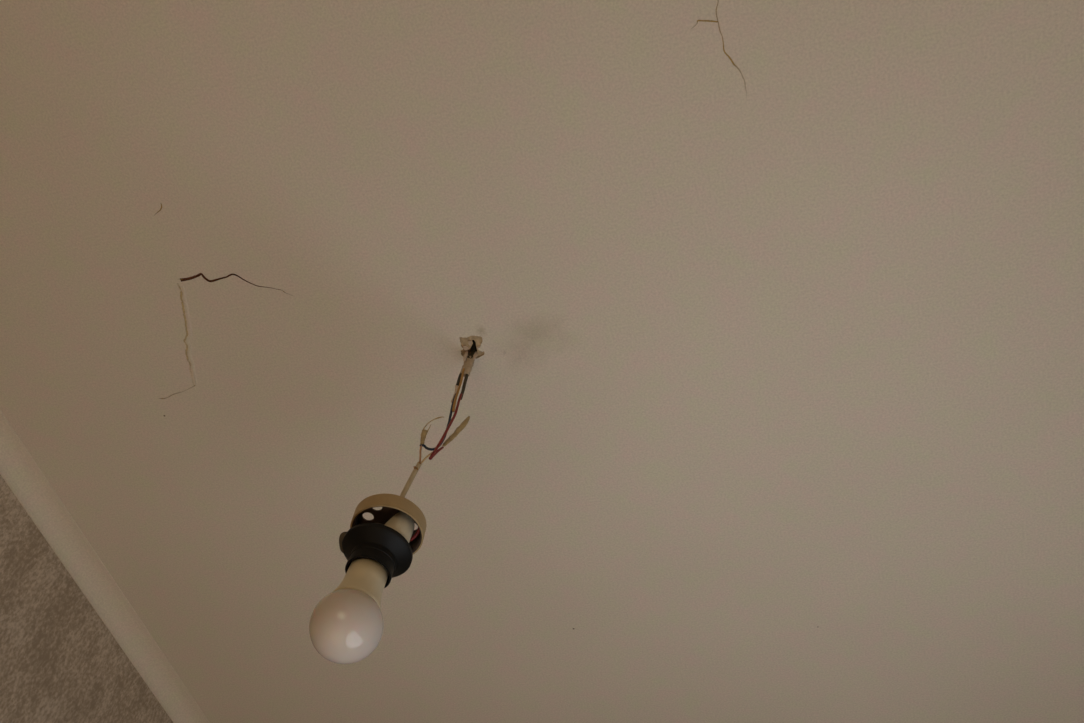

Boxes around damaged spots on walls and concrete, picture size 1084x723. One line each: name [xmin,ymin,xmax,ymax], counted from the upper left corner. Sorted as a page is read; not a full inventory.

crack [697,8,736,66]
crack [180,273,284,292]